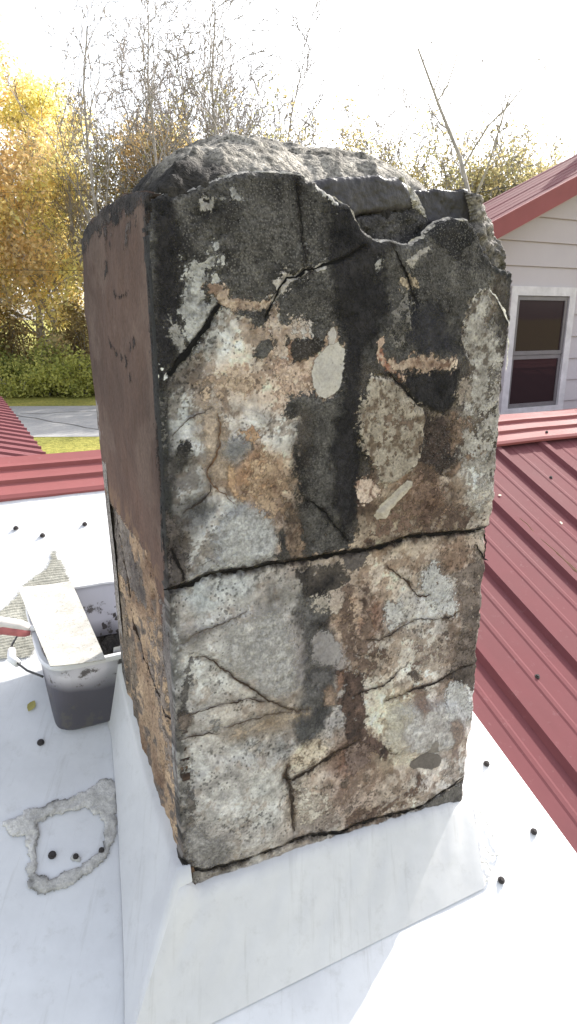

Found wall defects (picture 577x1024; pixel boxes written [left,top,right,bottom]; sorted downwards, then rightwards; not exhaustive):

crack [265,179,417,317]
crack [168,303,221,376]
peeling [148,169,509,563]
crack [163,499,488,641]
crack [353,663,474,701]
crack [178,739,461,872]